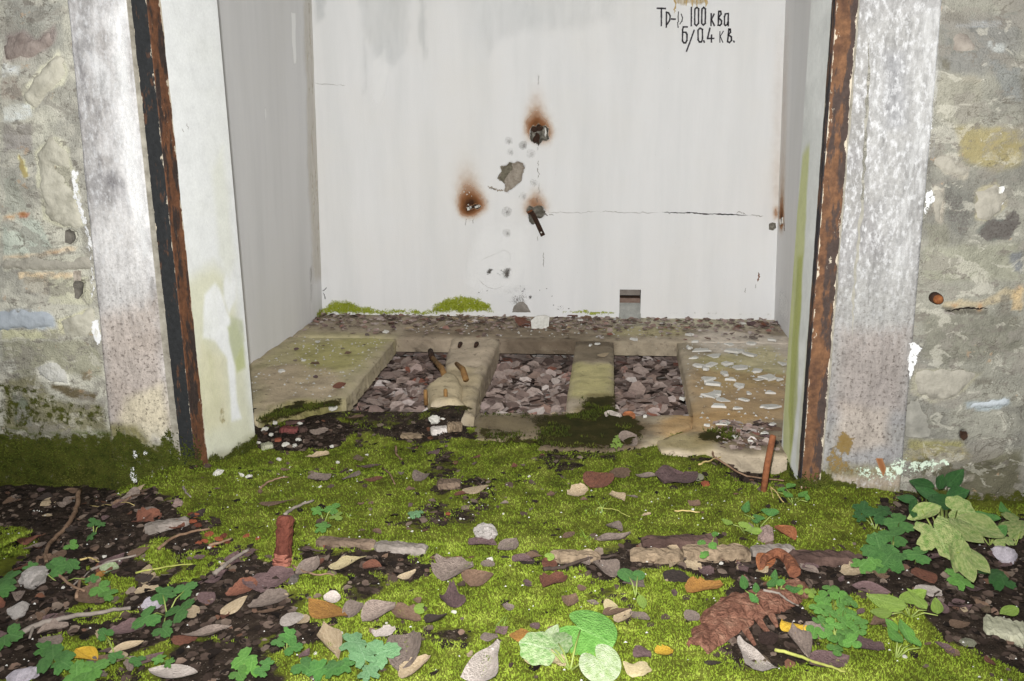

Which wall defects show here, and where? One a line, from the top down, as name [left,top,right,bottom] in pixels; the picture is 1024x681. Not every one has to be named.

corrosion [526,110,551,136]
spalling [488,161,525,192]
corrosion [458,184,485,225]
crack [536,147,762,266]
corrosion [774,195,785,231]